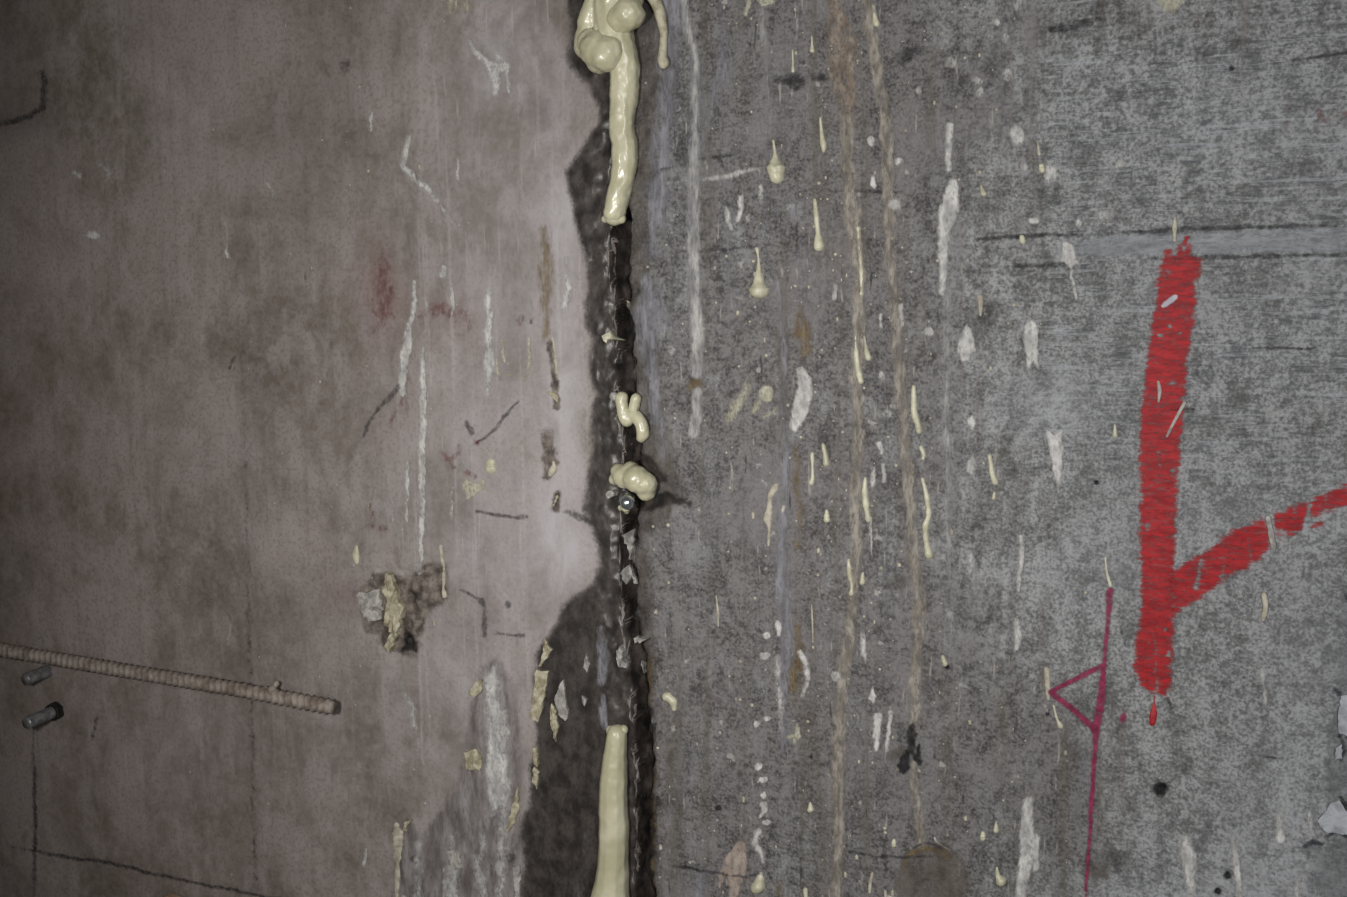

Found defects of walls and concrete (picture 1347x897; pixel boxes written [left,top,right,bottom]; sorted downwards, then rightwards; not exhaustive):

crack [5,72,48,124]
leakage [520,0,727,897]
spalling [356,545,447,655]
crack [602,198,755,897]
peeling [1334,688,1347,760]
crack [24,754,264,897]
peeling [1303,796,1347,847]